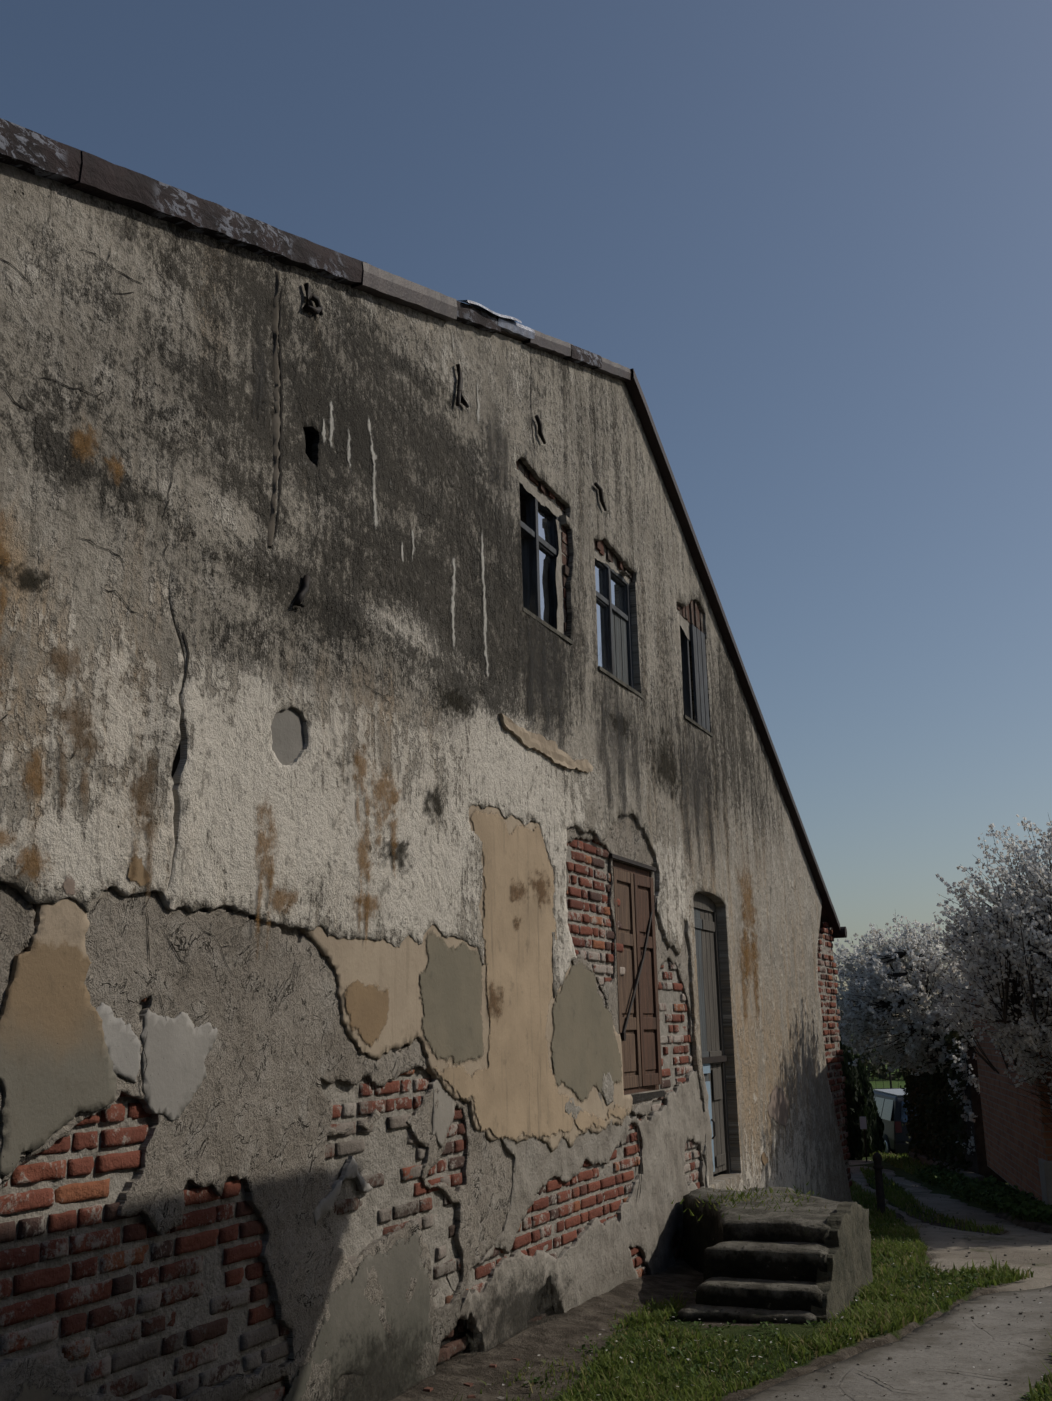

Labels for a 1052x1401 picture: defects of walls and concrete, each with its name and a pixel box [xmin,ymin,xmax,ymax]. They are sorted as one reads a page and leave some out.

crack [161,450,176,569]
spalling [303,428,313,462]
leakage [322,401,351,467]
leakage [367,418,378,526]
crack [182,631,190,683]
leakage [481,536,489,676]
corrosion [25,701,98,805]
crack [171,743,180,779]
corrosion [256,806,298,946]
corrosion [353,746,399,940]
spalling [0,805,694,1401]
flaking render [684,1141,700,1189]